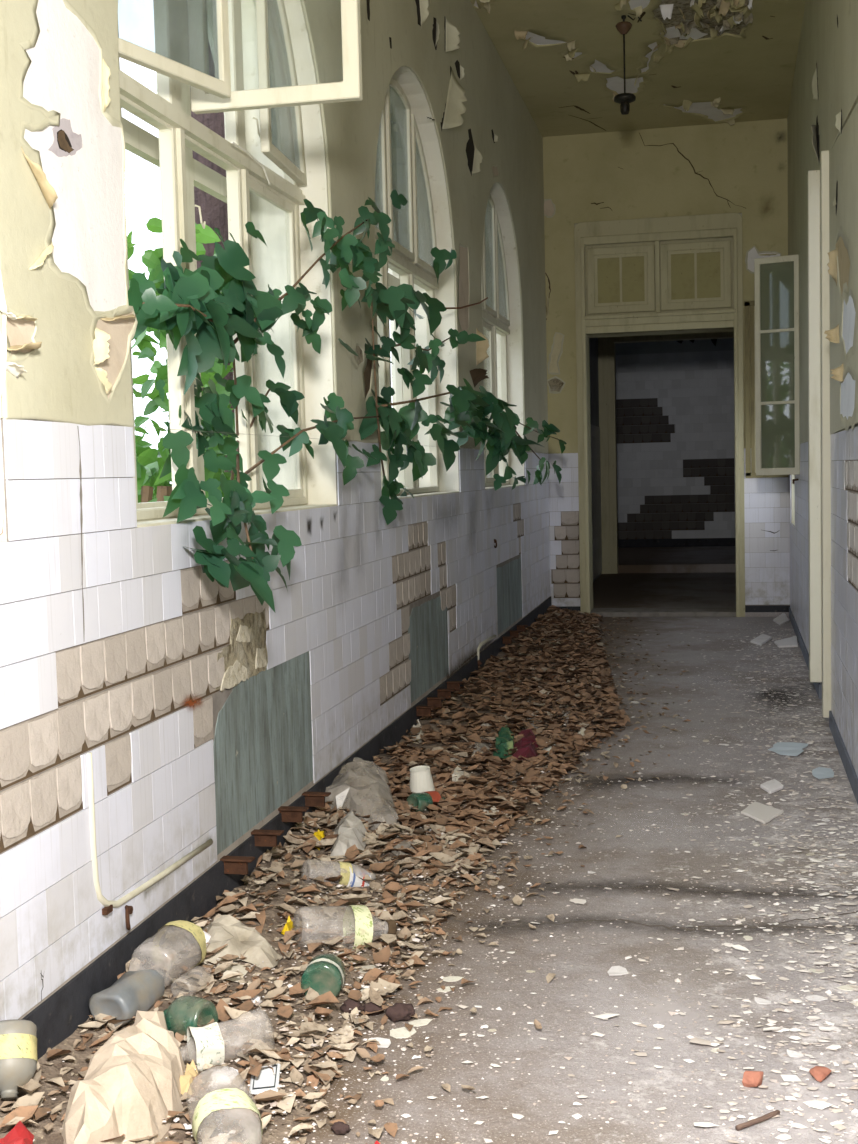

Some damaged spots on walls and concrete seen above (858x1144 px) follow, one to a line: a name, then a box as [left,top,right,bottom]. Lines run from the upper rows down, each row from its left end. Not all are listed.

peeling [615,0,754,55]
peeling [658,97,750,125]
peeling [18,0,138,408]
peeling [472,143,483,174]
crack [639,133,745,208]
spalling [0,566,270,854]